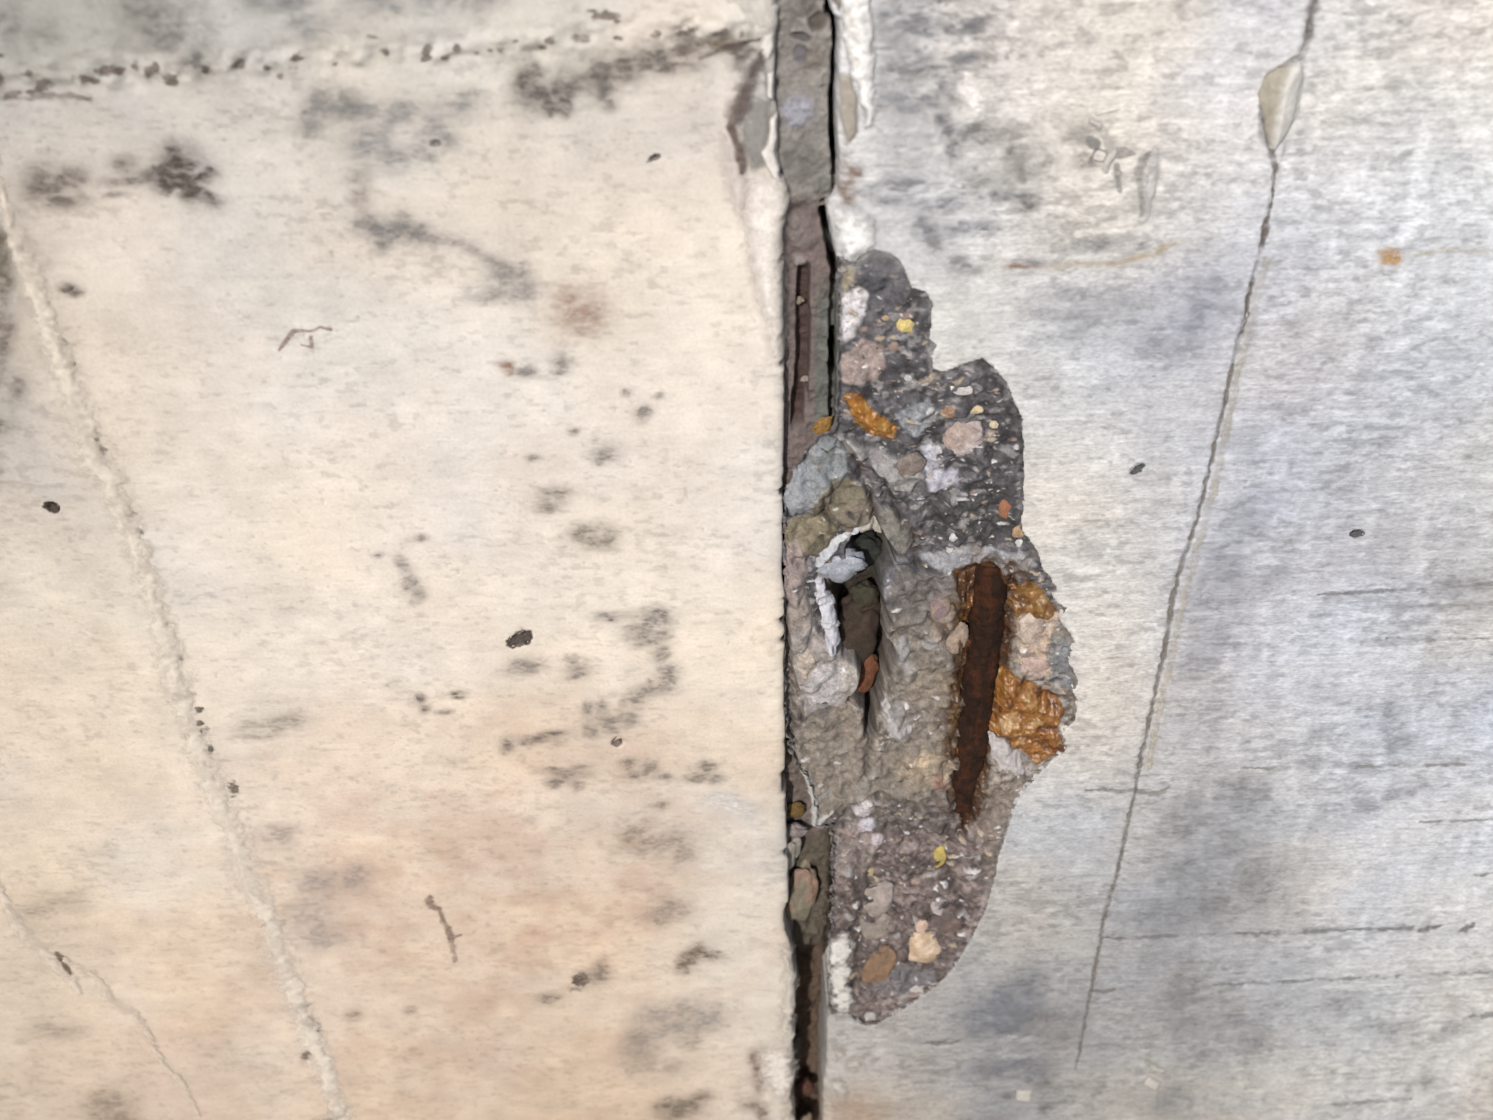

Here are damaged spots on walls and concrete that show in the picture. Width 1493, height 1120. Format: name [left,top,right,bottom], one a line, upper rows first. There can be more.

crack [1300,0,1317,59]
mould [27,171,83,205]
mould [111,147,214,200]
leakage [515,0,786,354]
crack [1076,118,1278,1070]
spalling [782,250,1078,1026]
mould [585,610,674,735]
corrosion [945,562,1067,822]
crack [1356,761,1465,769]
leakage [678,947,720,969]
crack [1215,979,1310,987]
crack [1239,922,1475,936]